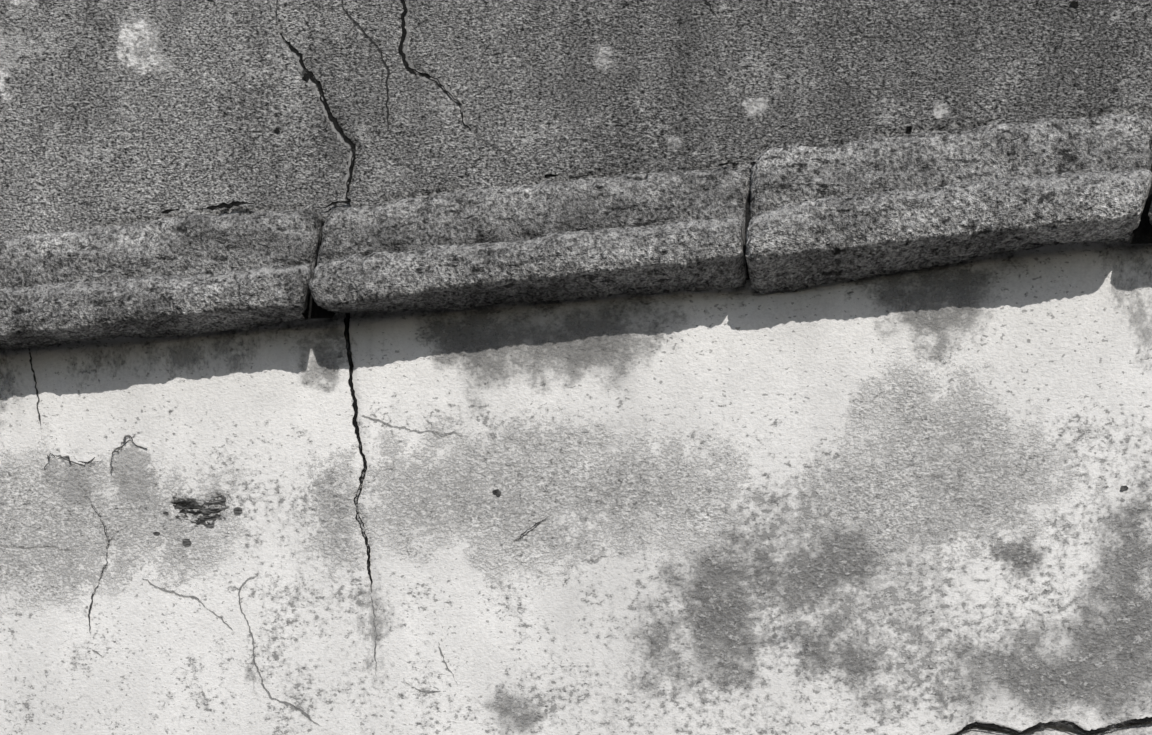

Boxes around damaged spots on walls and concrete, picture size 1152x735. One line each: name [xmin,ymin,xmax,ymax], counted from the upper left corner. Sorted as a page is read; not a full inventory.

crack [276,0,356,208]
crack [341,0,527,164]
damp [303,327,341,389]
damp [423,295,660,379]
damp [879,264,991,357]
crack [82,489,127,656]
flaking render [0,431,246,608]
crack [143,576,320,726]
crack [344,313,463,666]
damp [640,534,874,688]
damp [949,498,1152,719]
crack [949,717,1152,735]